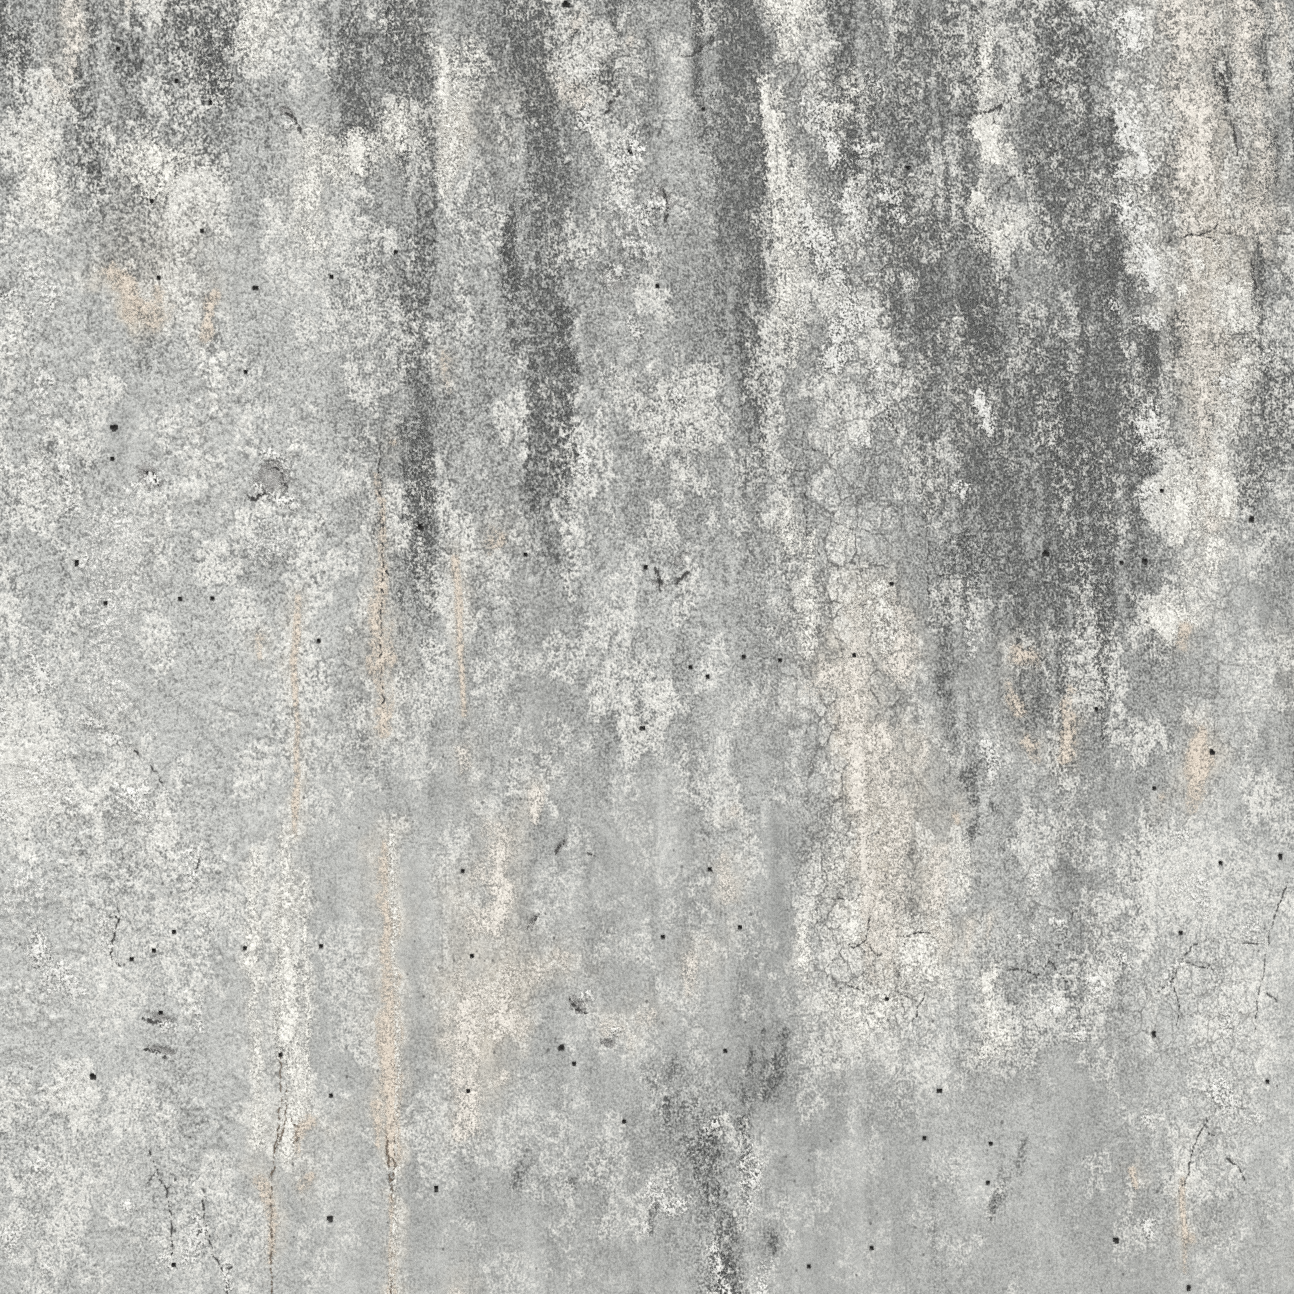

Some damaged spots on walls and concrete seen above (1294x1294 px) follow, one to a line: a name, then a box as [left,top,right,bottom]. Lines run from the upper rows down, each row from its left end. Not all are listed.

leakage [595,62,616,89]
leakage [606,0,621,38]
leakage [291,0,490,608]
leakage [500,0,578,514]
leakage [691,0,1294,739]
crack [1157,882,1288,1030]
leakage [738,1029,788,1103]
crack [146,1150,233,1294]
crack [269,1052,299,1294]
crack [385,1132,397,1202]
leakage [697,1120,721,1166]
leakage [706,1188,741,1294]